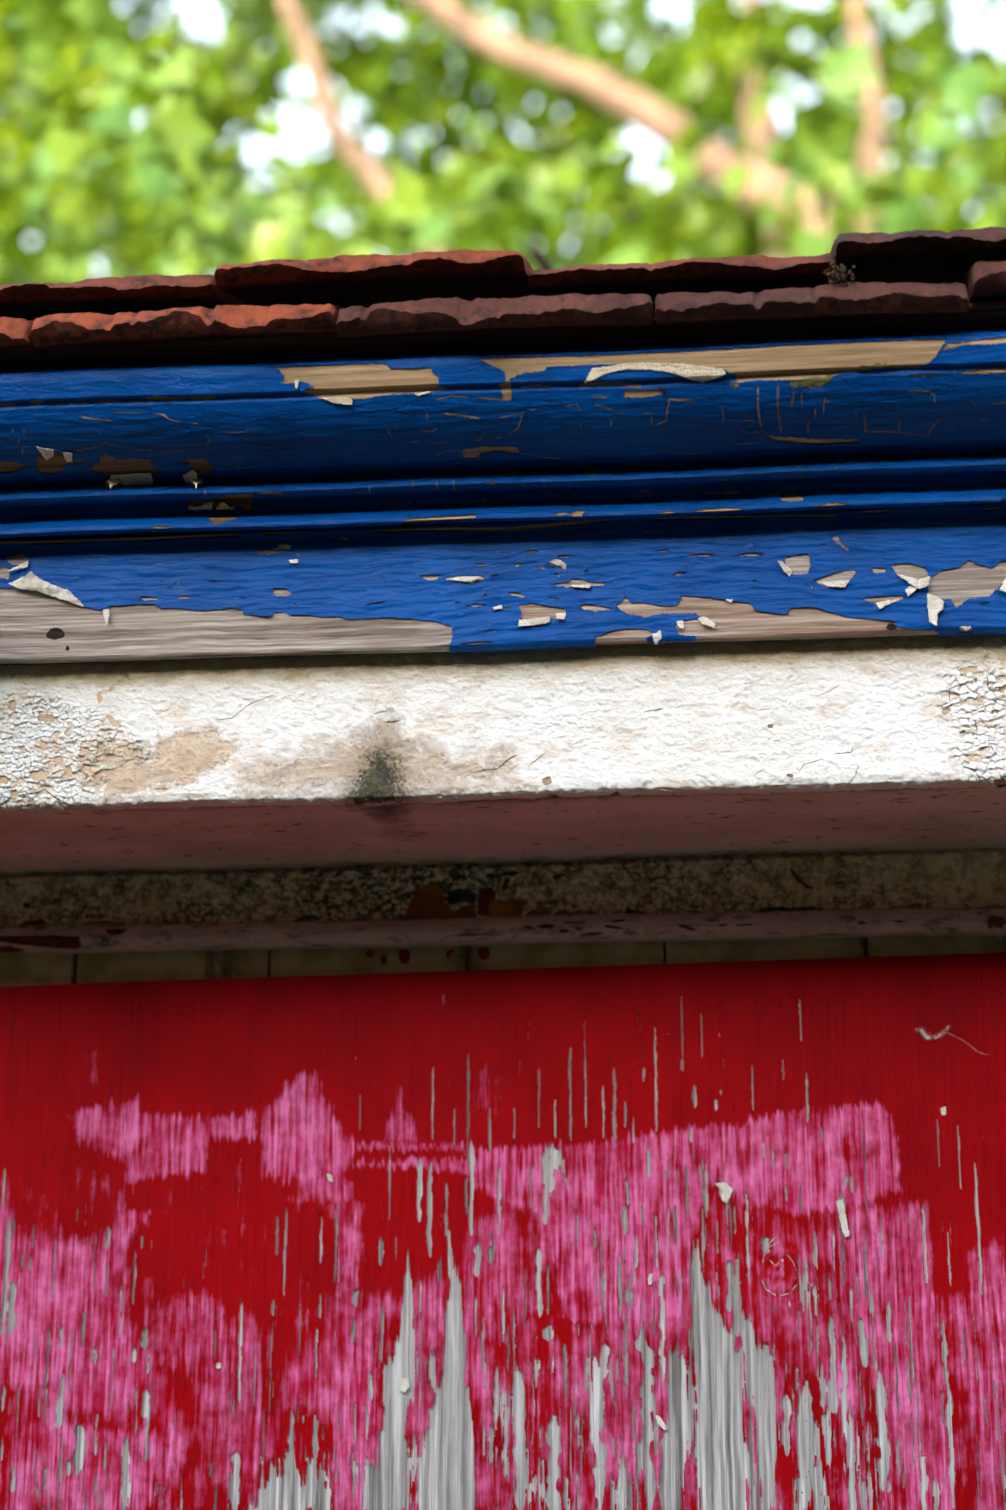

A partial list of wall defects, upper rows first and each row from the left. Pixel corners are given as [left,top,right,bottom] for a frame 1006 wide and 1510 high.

peeling [277,363,448,405]
peeling [479,337,1006,400]
peeling [0,446,498,664]
peeling [371,435,1006,645]
peeling [0,775,35,806]
flaking render [18,679,235,798]
water stain [246,723,505,817]
peeling [941,654,1006,785]
peeling [681,996,720,1071]
peeling [0,1010,1006,1510]